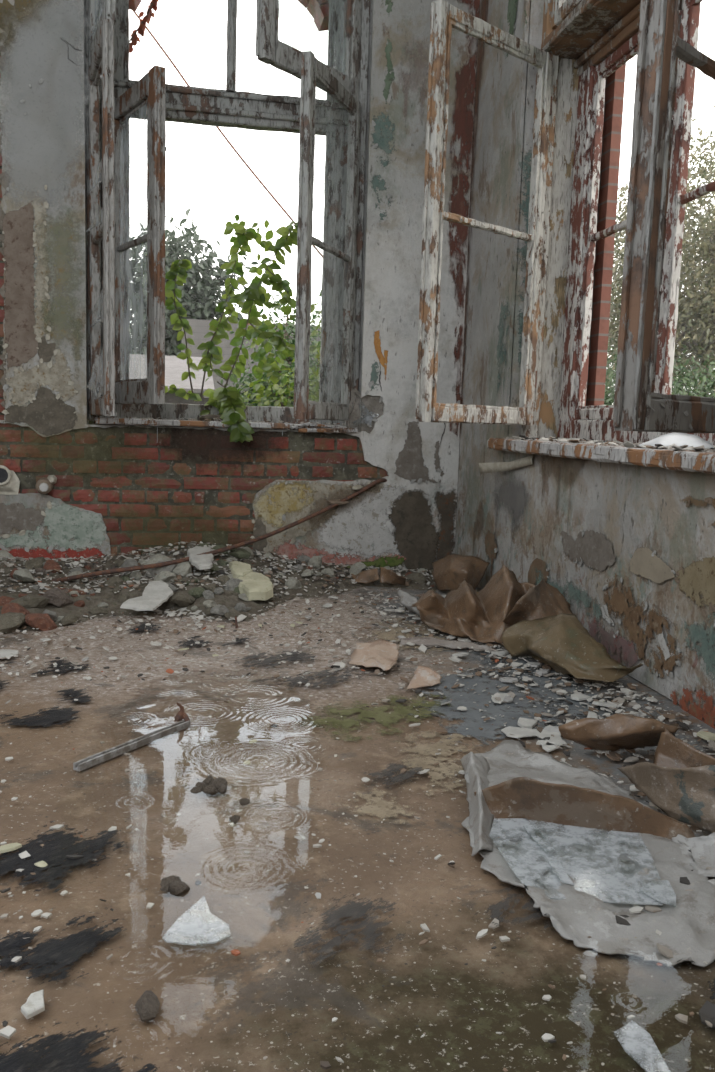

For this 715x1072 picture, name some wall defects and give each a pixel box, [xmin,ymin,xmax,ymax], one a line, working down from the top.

peeling [370,39,395,221]
flaking render [0,115,444,566]
water stain [388,489,458,573]
peeling [528,528,683,678]
peeling [670,686,715,729]